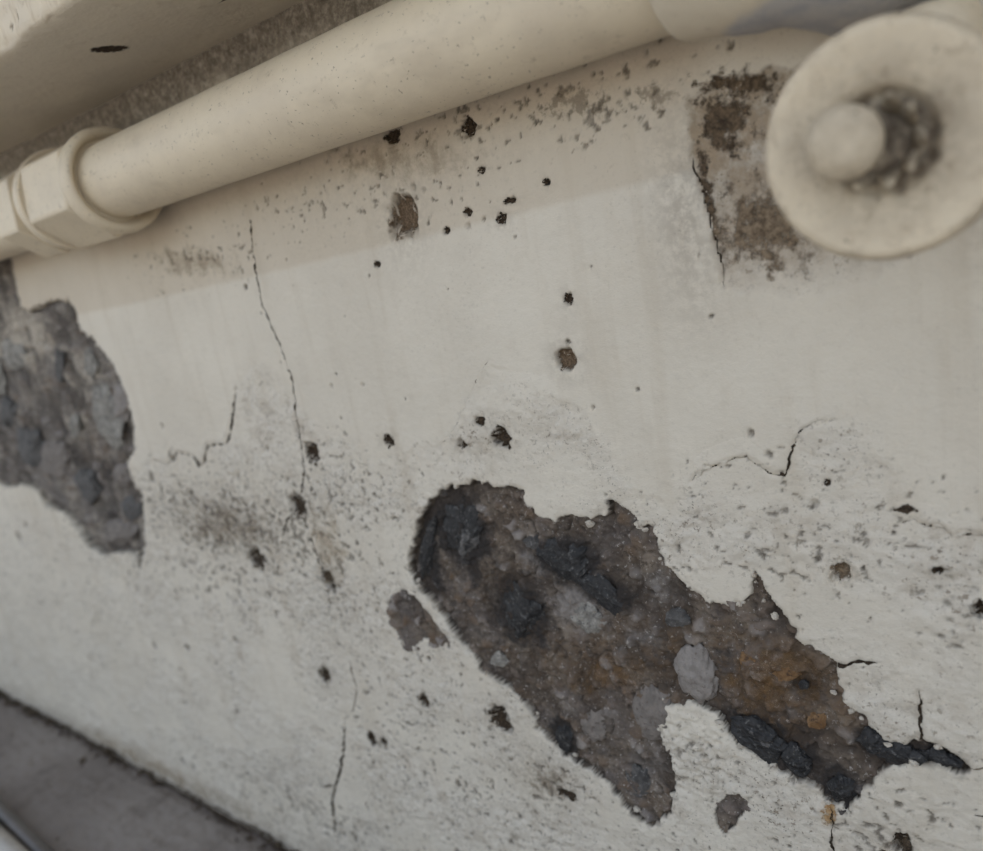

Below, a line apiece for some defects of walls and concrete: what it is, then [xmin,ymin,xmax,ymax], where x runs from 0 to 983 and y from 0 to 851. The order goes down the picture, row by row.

crack [692,159,724,285]
spalling [0,258,147,553]
crack [171,387,237,467]
crack [250,220,332,621]
crack [694,429,803,477]
spalling [386,481,967,823]
spalling [716,794,751,833]
crack [828,807,836,851]